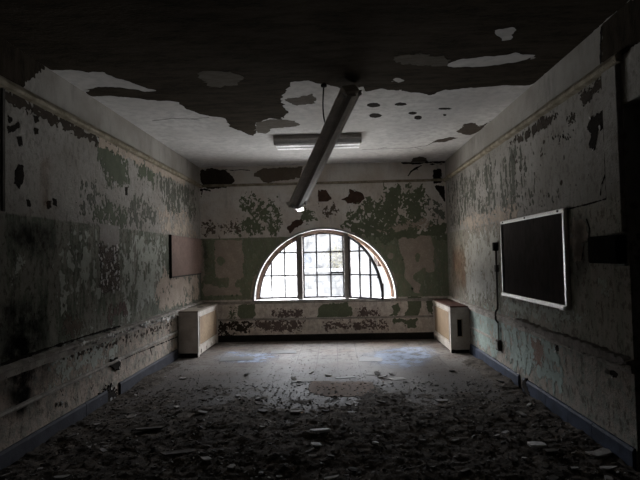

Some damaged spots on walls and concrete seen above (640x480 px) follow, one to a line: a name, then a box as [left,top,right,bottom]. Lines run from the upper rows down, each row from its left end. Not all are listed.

flaking render [0,0,640,136]
peeling [5,91,631,397]